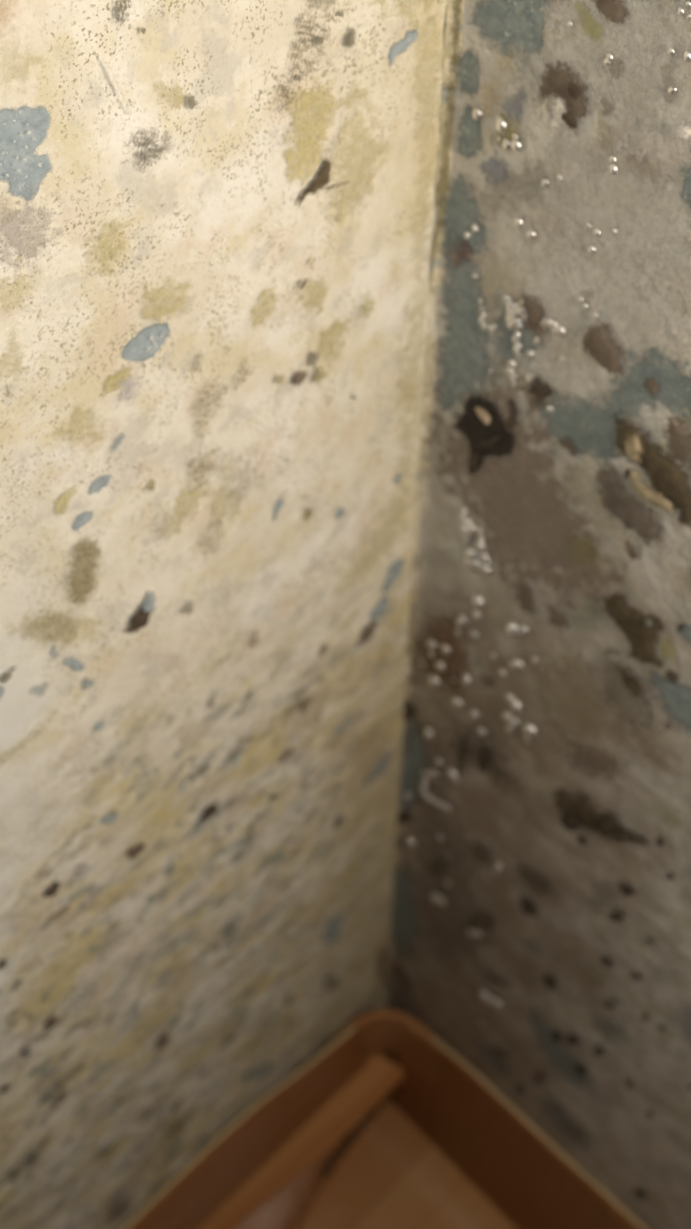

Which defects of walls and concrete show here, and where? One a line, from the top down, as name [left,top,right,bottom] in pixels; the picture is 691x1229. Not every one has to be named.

water stain [115,0,130,23]
water stain [344,29,356,48]
water stain [275,6,344,185]
water stain [134,131,163,168]
water stain [277,322,344,386]
water stain [55,487,75,514]
water stain [126,592,157,634]
water stain [28,611,93,691]
water stain [0,667,15,699]
water stain [201,802,218,822]
water stain [128,843,145,860]
water stain [44,882,60,897]